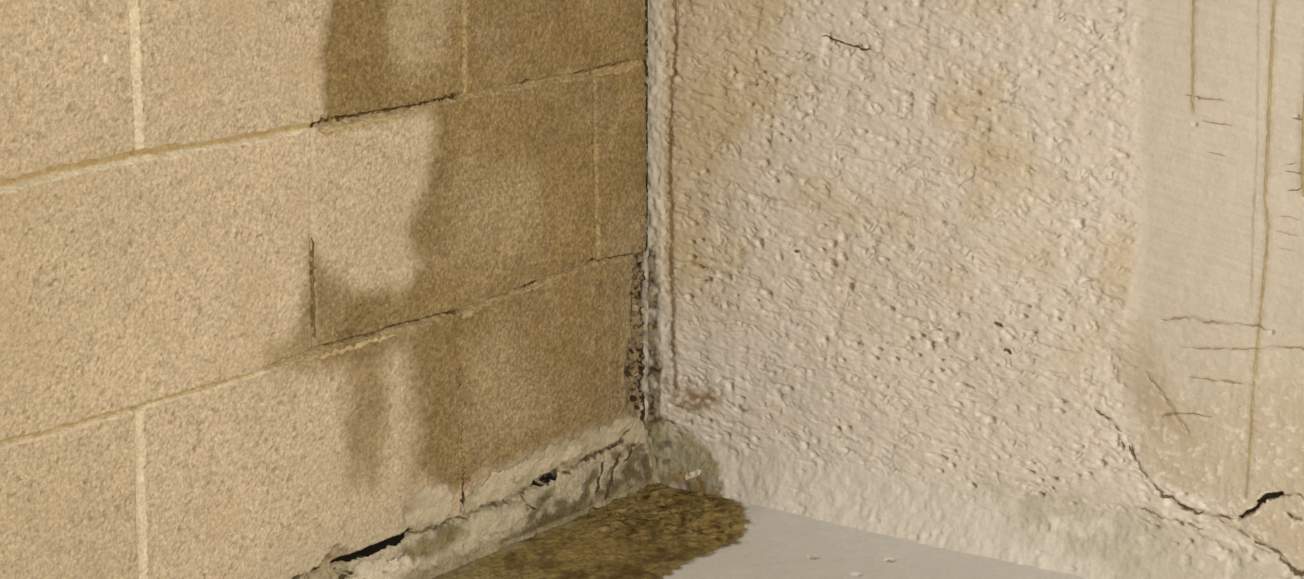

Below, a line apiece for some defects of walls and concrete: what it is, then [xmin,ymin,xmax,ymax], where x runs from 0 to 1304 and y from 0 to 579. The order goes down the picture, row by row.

water stain [317,0,647,487]
crack [299,0,678,577]
peeling [292,544,421,579]
water stain [434,417,750,579]
crack [1095,408,1304,577]